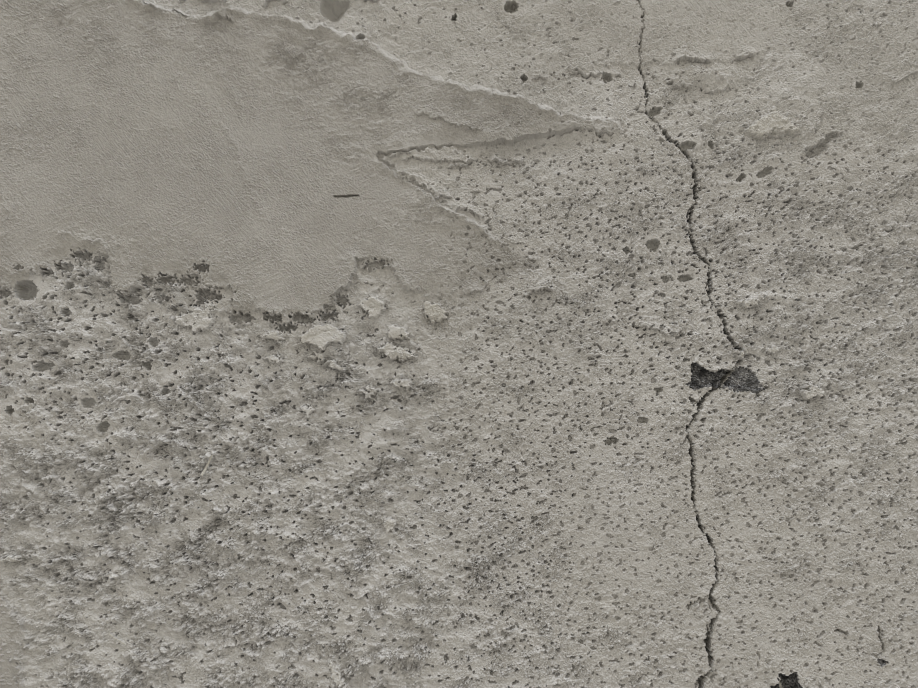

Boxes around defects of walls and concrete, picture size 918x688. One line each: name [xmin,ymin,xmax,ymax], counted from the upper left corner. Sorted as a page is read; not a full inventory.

flaking render [0,246,453,455]
crack [636,0,747,688]
peeling [687,362,765,393]
peeling [770,672,803,688]